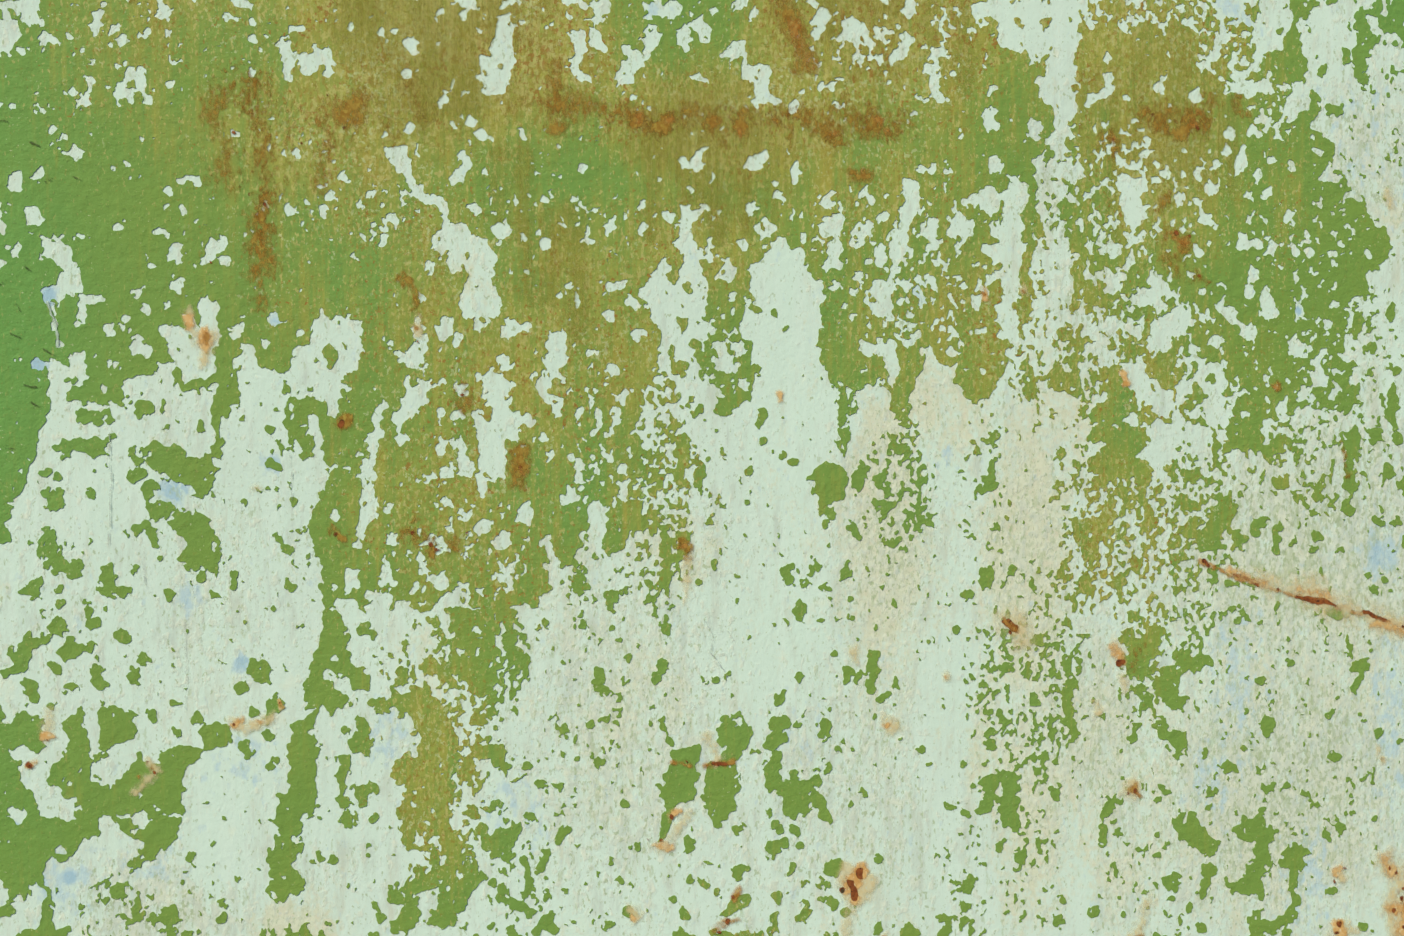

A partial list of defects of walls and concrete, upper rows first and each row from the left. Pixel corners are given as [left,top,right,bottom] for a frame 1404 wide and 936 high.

rust [314,91,369,186]
rust [546,60,751,137]
peeling [561,0,799,114]
rust [769,102,914,147]
peeling [1181,0,1293,99]
peeling [0,166,105,327]
peeling [849,177,938,349]
peeling [1082,136,1155,295]
peeling [352,121,555,550]
rust [1199,558,1404,633]
rust [839,862,876,936]
rust [1381,855,1404,936]